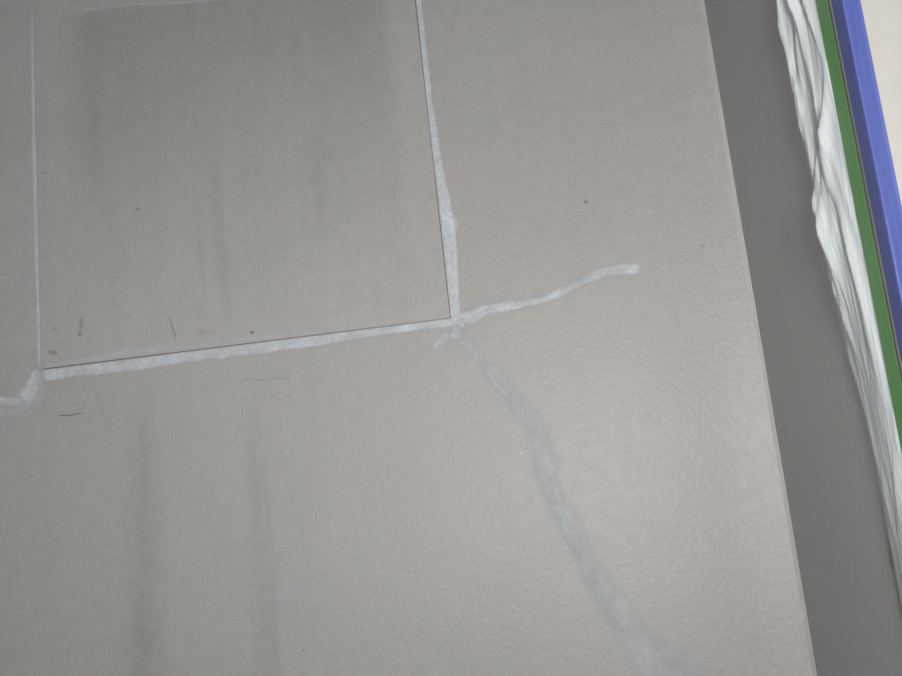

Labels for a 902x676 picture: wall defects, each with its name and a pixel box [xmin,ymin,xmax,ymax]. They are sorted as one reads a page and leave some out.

crack [452,263,641,331]
crack [0,370,42,412]